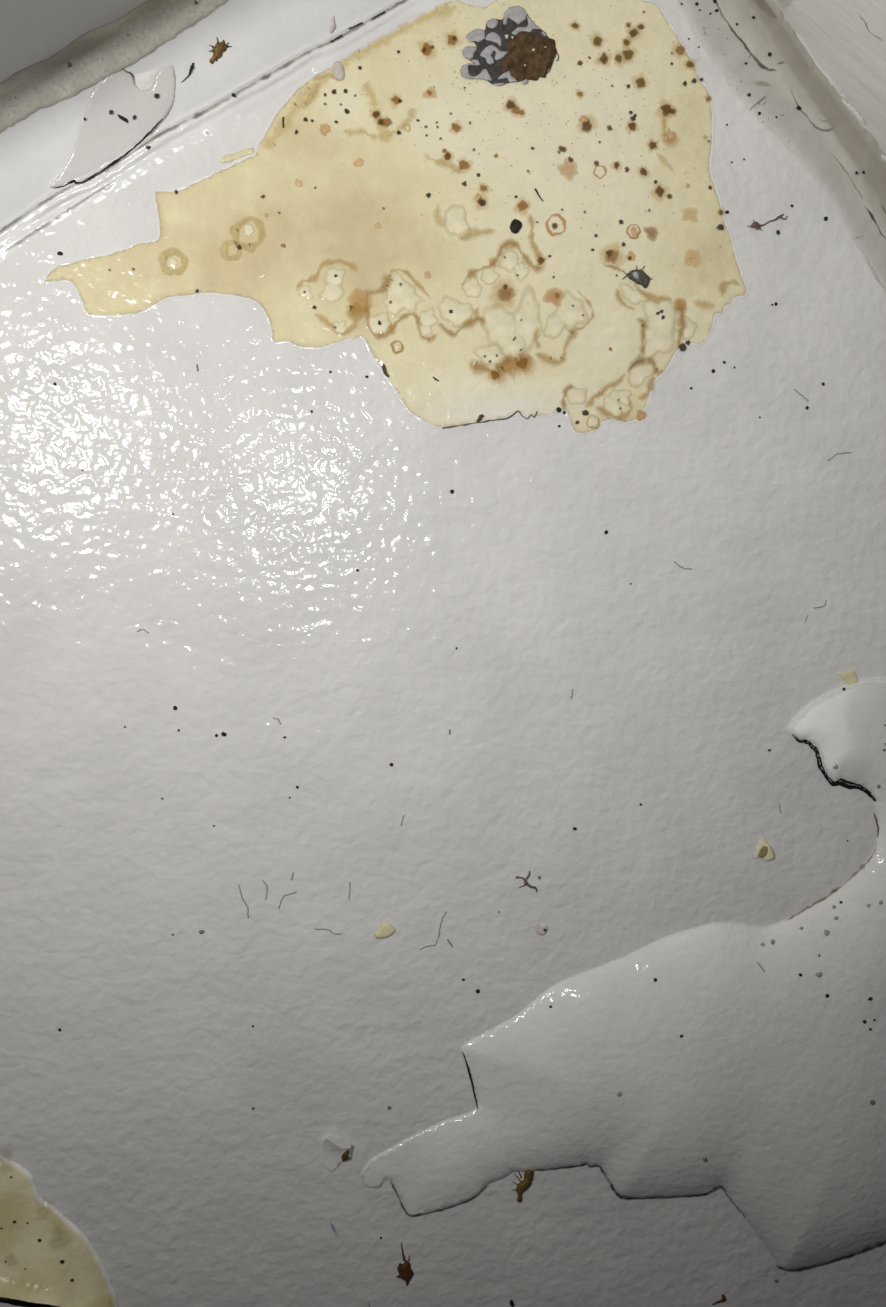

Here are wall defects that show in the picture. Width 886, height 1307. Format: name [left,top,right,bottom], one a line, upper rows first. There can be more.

water stain [41,0,749,435]
peeling [0,1153,118,1307]